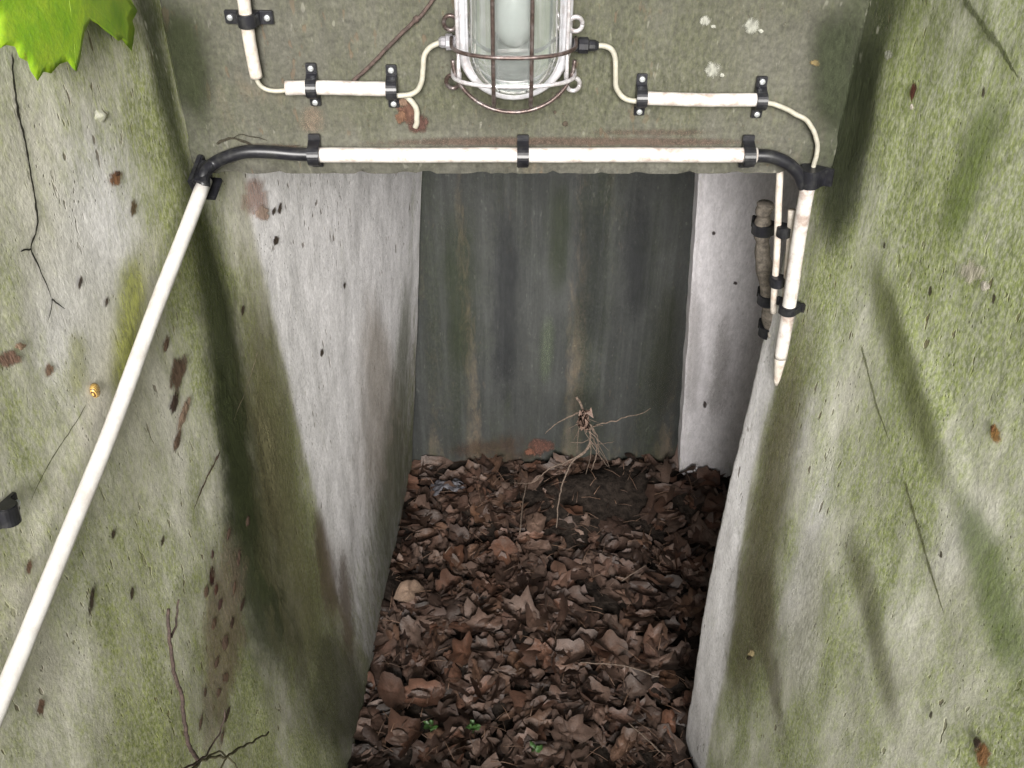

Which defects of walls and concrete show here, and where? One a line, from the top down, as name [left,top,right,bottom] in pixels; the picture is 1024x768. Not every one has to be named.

corrosion [395,98,719,145]
crack [11,54,65,320]
crack [861,347,889,439]
crack [905,483,943,610]